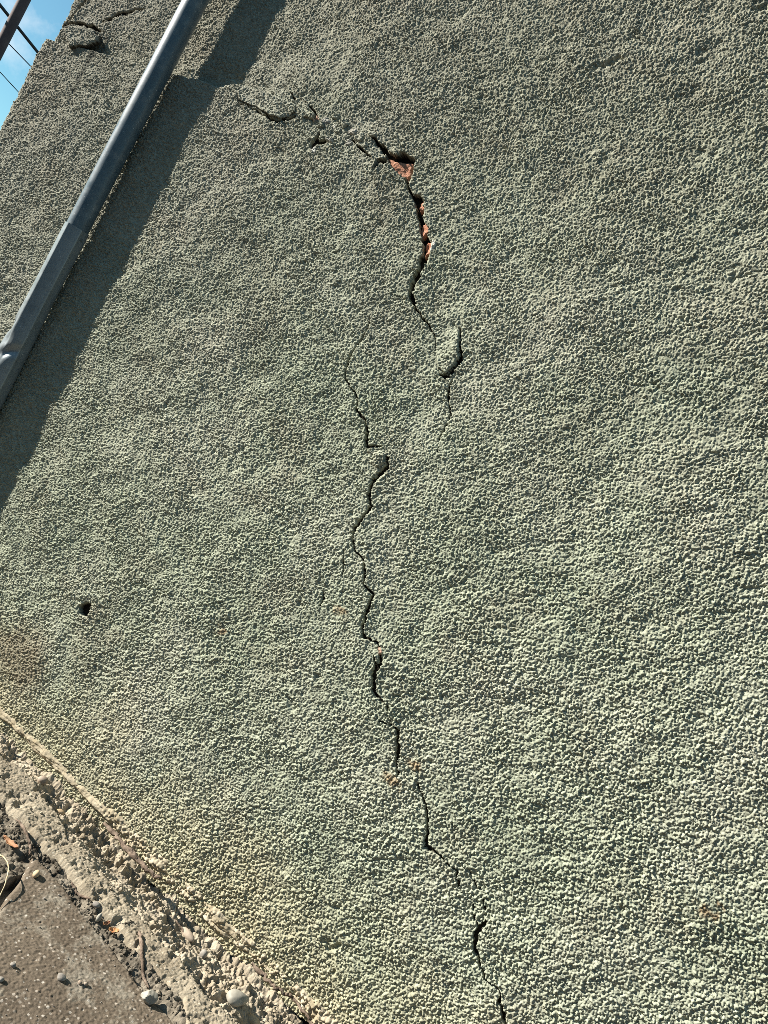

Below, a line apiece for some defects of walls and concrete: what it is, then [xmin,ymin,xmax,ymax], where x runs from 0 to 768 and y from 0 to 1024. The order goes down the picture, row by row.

crack [64,10,143,50]
crack [354,140,463,452]
crack [343,358,507,1024]